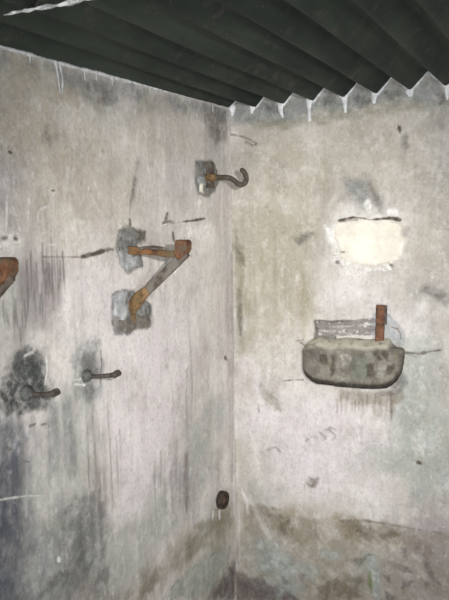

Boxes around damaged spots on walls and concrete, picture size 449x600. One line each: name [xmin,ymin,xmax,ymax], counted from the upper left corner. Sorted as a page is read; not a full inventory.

peeling [323,199,407,274]
crack [338,215,401,223]
peeling [113,291,151,333]
damp [0,348,70,459]
damp [171,542,298,600]